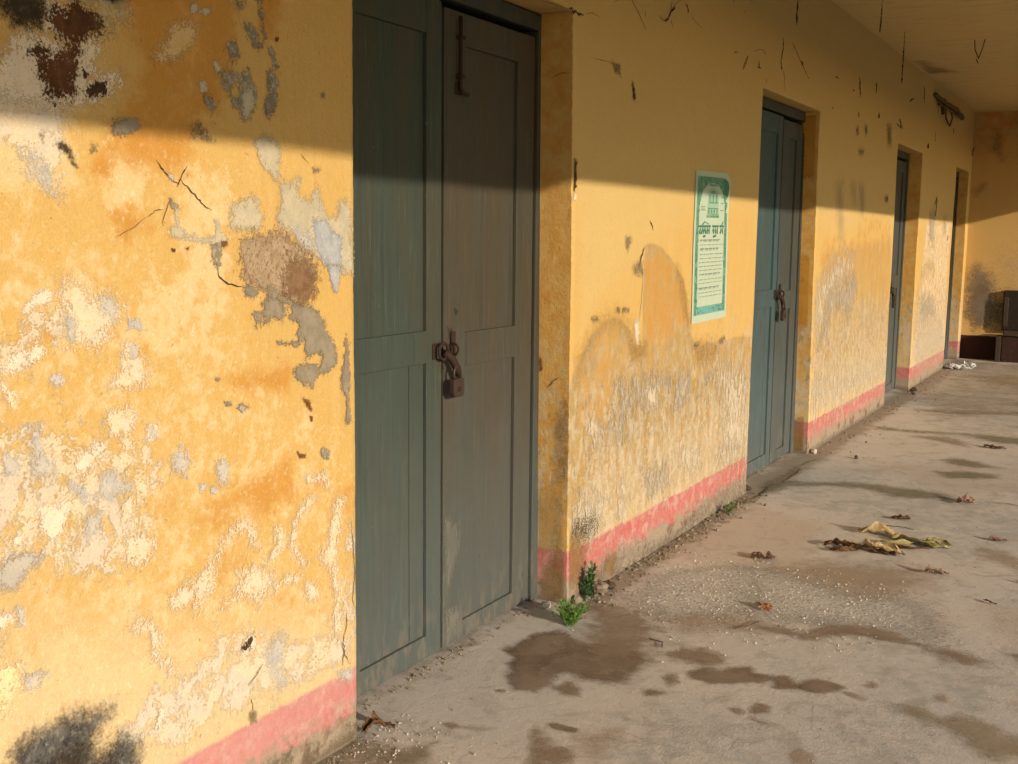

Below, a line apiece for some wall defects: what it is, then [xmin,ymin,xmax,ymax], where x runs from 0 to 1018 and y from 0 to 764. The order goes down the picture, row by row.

leakage [0,0,49,32]
peeling [0,0,142,139]
peeling [151,1,211,65]
peeling [196,0,280,124]
crack [118,161,245,287]
peeling [227,133,355,425]
peeling [0,272,162,595]
peeling [198,456,230,494]
peeling [167,469,348,644]
leakage [599,473,746,581]
spalling [237,631,257,659]
leakage [10,706,141,764]